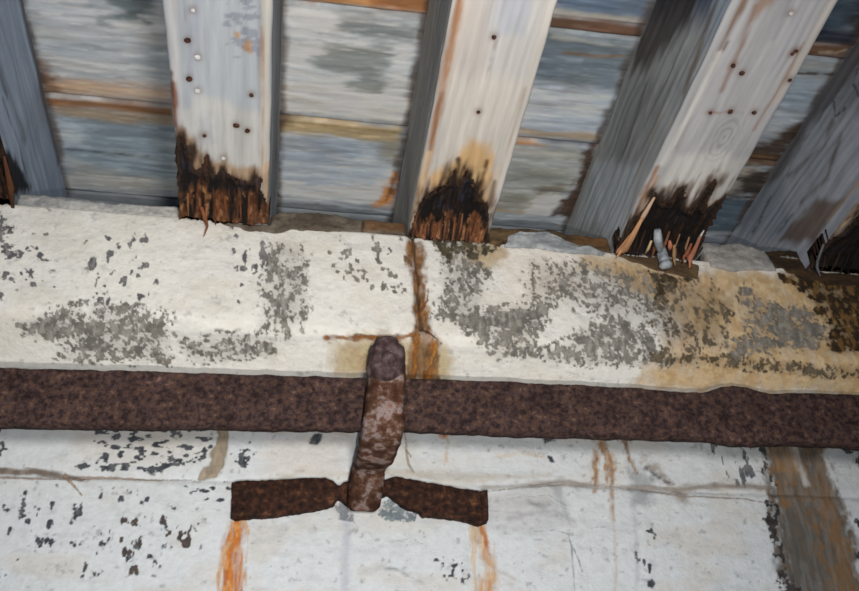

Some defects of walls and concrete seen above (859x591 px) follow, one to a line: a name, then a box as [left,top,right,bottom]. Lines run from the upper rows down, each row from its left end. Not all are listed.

corrosion [324,334,381,371]
corrosion [392,241,446,379]
leakage [583,257,859,395]
corrosion [594,440,614,492]
leakage [758,446,859,591]
corrosion [220,520,248,591]
corrosion [469,526,495,591]